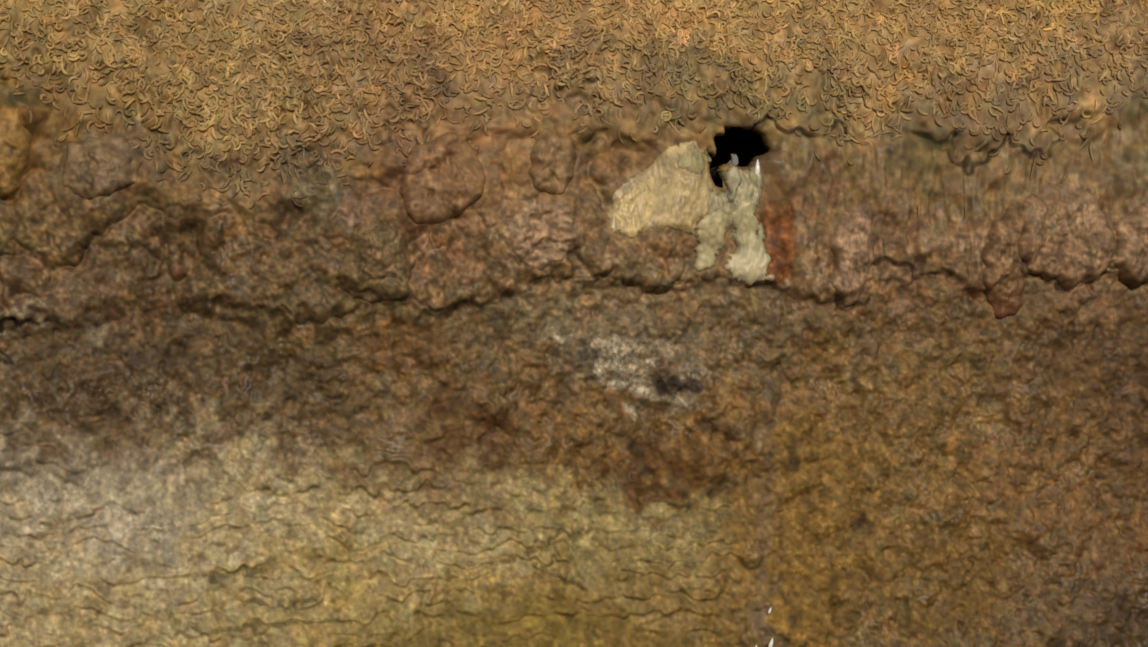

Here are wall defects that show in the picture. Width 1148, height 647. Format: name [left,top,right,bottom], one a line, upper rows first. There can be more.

peeling [607,141,771,286]
rust [763,193,795,283]
crack [872,258,934,279]
crack [1021,266,1111,291]
crack [0,318,49,364]